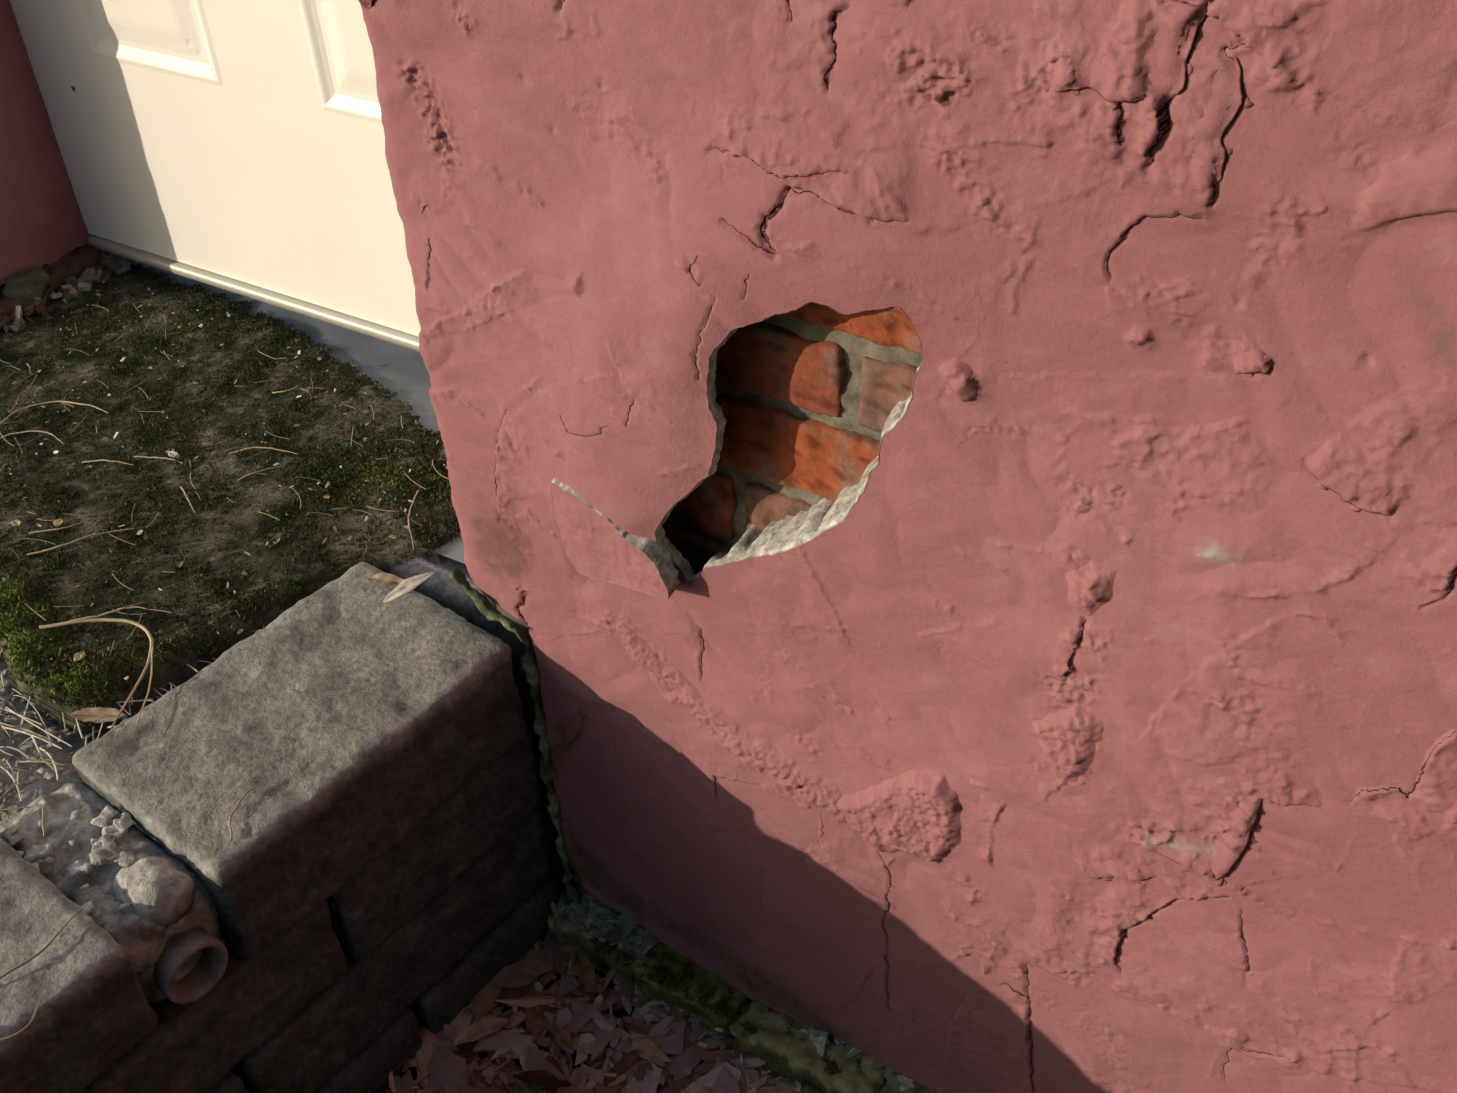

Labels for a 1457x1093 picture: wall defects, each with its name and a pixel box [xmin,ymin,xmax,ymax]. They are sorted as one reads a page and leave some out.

crack [823,6,849,86]
crack [1116,97,1170,165]
crack [689,147,908,377]
crack [1106,179,1216,280]
spalling [551,302,922,600]
crack [880,856,891,1009]
crack [1004,964,1034,1092]